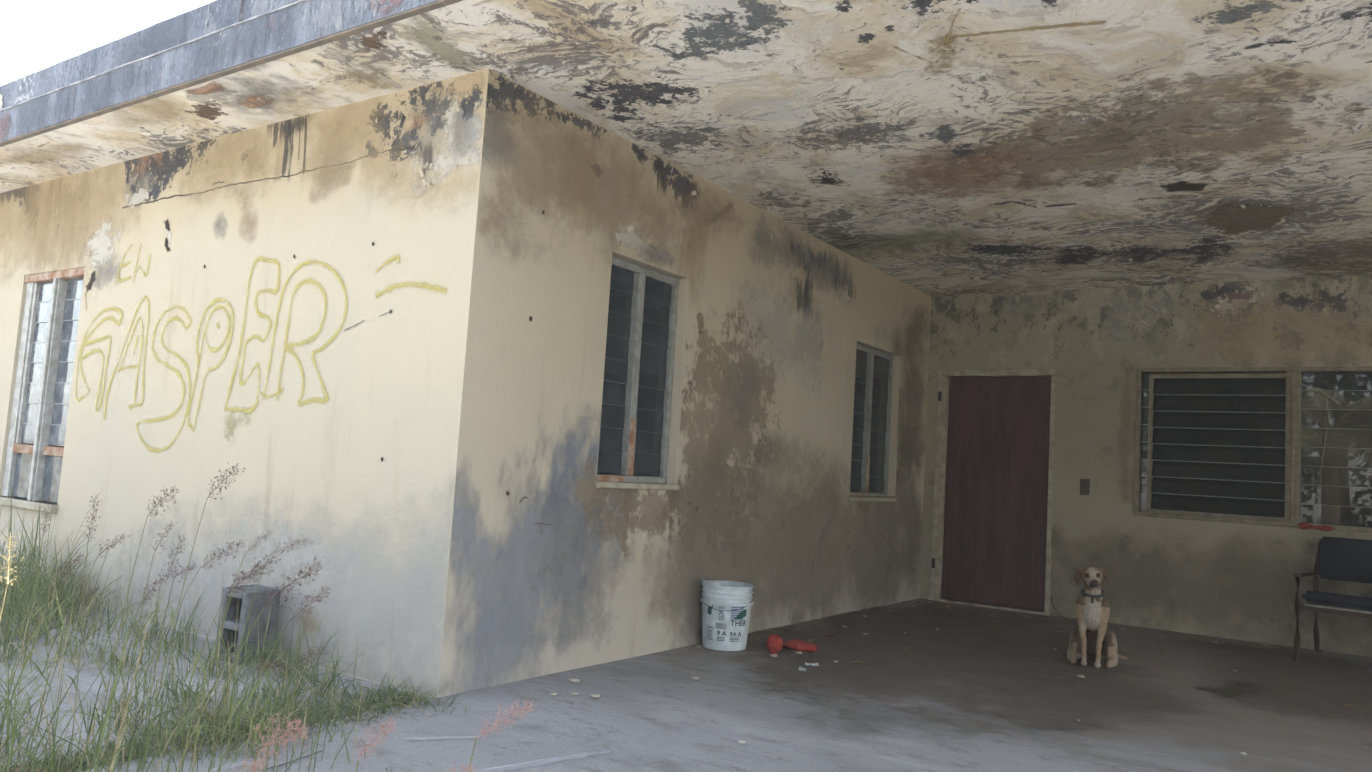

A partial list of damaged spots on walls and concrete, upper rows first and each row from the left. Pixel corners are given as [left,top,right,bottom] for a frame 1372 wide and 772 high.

damp [652,0,793,61]
damp [835,0,852,12]
damp [857,0,1105,73]
damp [1244,41,1295,49]
damp [124,138,216,203]
crack [122,142,418,209]
damp [268,114,310,175]
damp [365,81,454,177]
damp [486,69,726,211]
damp [805,168,852,187]
damp [960,235,1244,268]
damp [1279,232,1372,320]